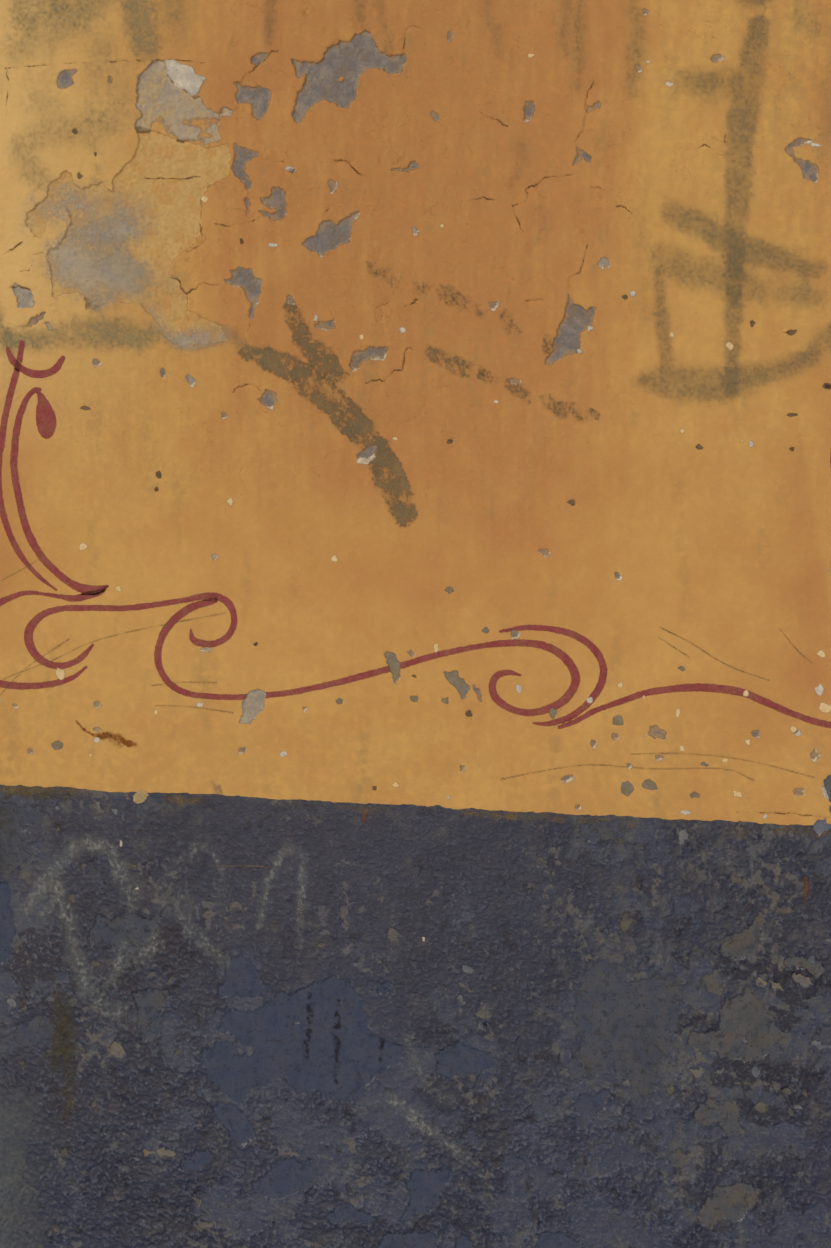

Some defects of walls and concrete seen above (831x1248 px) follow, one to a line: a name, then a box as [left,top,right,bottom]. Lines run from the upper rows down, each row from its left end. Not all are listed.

peeling [292,31,407,123]
peeling [785,138,823,183]
peeling [25,60,288,349]
peeling [302,211,360,257]
peeling [12,283,51,331]
peeling [545,295,596,365]
rust [77,722,134,747]
peeling [780,775,831,838]